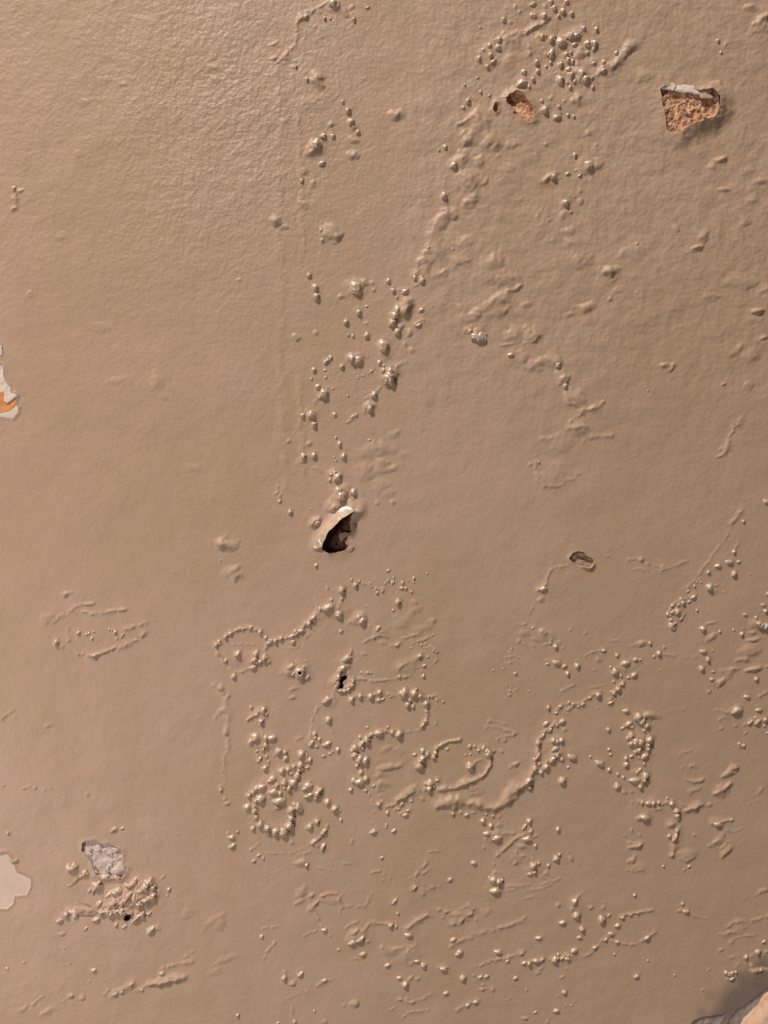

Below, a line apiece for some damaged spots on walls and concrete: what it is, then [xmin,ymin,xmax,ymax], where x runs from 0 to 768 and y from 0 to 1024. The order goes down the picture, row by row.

spalling [489,85,541,130]
spalling [642,70,738,154]
peeling [0,346,22,422]
peeling [566,549,597,572]
peeling [0,848,34,913]
peeling [52,826,171,937]
spalling [691,988,768,1024]